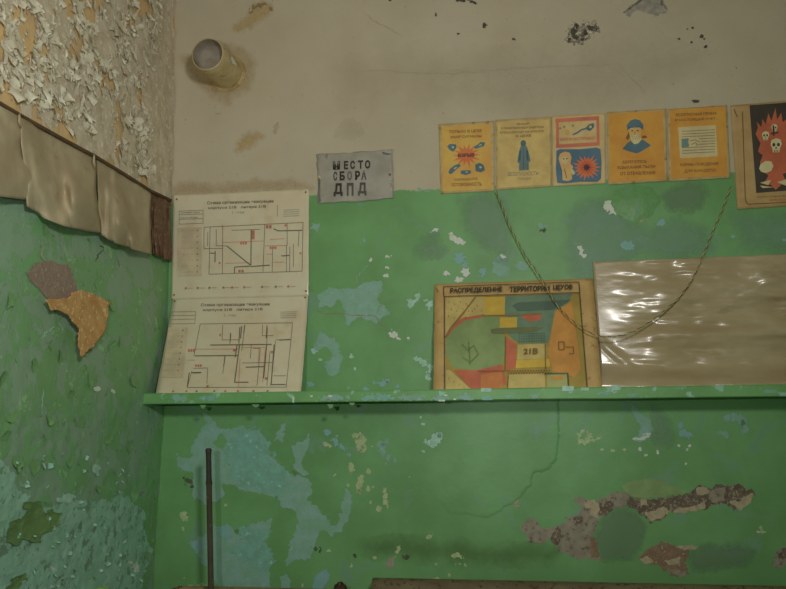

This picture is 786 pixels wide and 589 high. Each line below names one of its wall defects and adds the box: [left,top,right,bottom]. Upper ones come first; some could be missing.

spalling [623,0,668,17]
peeling [0,0,176,204]
peeling [27,249,111,357]
peeling [0,453,153,589]
peeling [176,413,397,589]
spalling [520,483,756,562]
spalling [638,541,699,577]